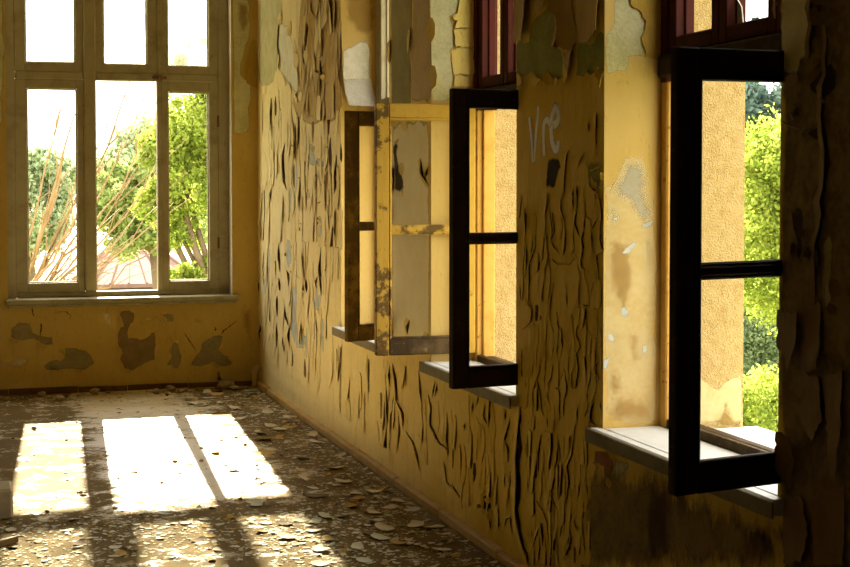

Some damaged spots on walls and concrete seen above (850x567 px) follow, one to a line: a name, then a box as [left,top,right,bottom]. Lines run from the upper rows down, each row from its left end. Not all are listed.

peeling [386,0,474,104]
peeling [513,0,661,88]
peeling [772,0,825,86]
peeling [257,0,377,432]
flaking render [9,321,94,375]
flaking render [112,307,233,374]
peeling [375,360,405,452]
crack [386,363,463,509]
crack [463,322,601,565]